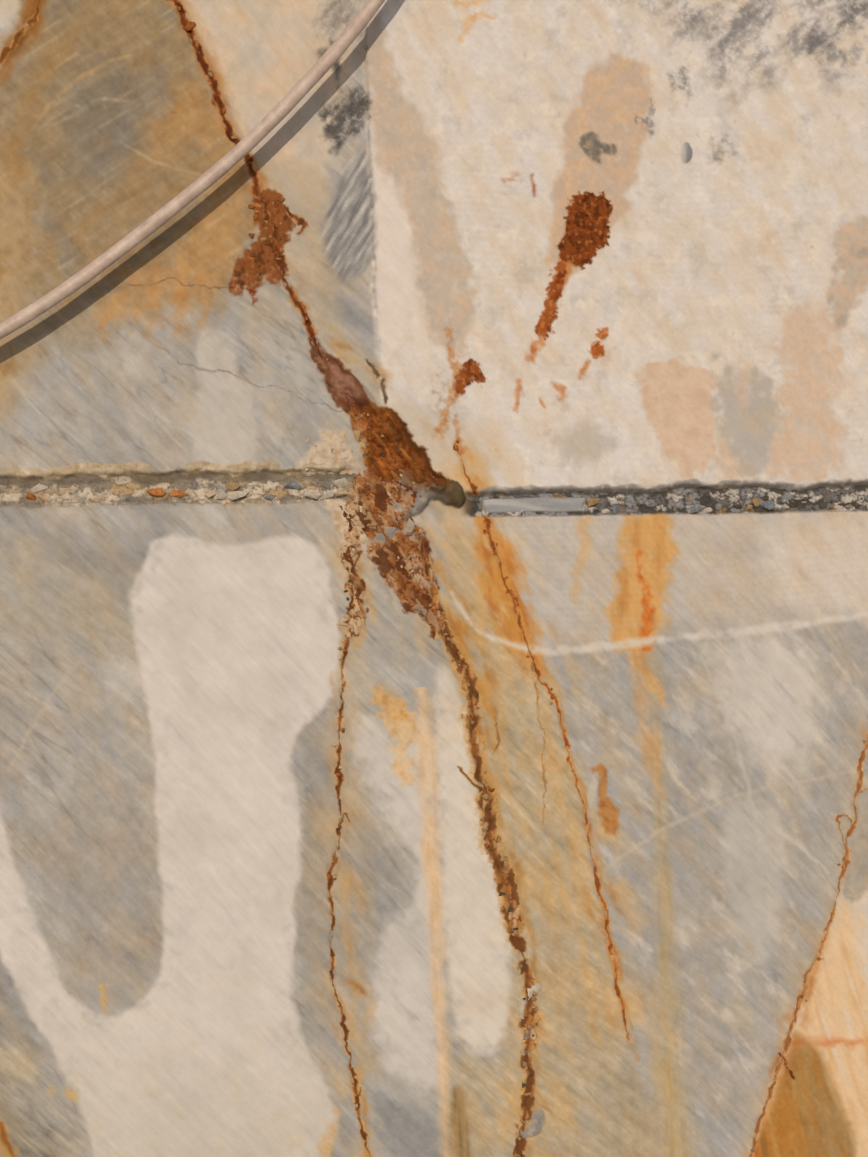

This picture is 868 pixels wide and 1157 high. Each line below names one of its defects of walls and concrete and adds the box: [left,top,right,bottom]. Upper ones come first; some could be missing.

crack [0,0,52,104]
water stain [0,0,258,431]
crack [118,277,228,290]
crack [156,0,395,413]
rust [427,324,488,455]
rust [511,190,614,413]
crack [315,549,380,1157]
crack [409,439,868,1157]
water stain [755,894,868,1157]